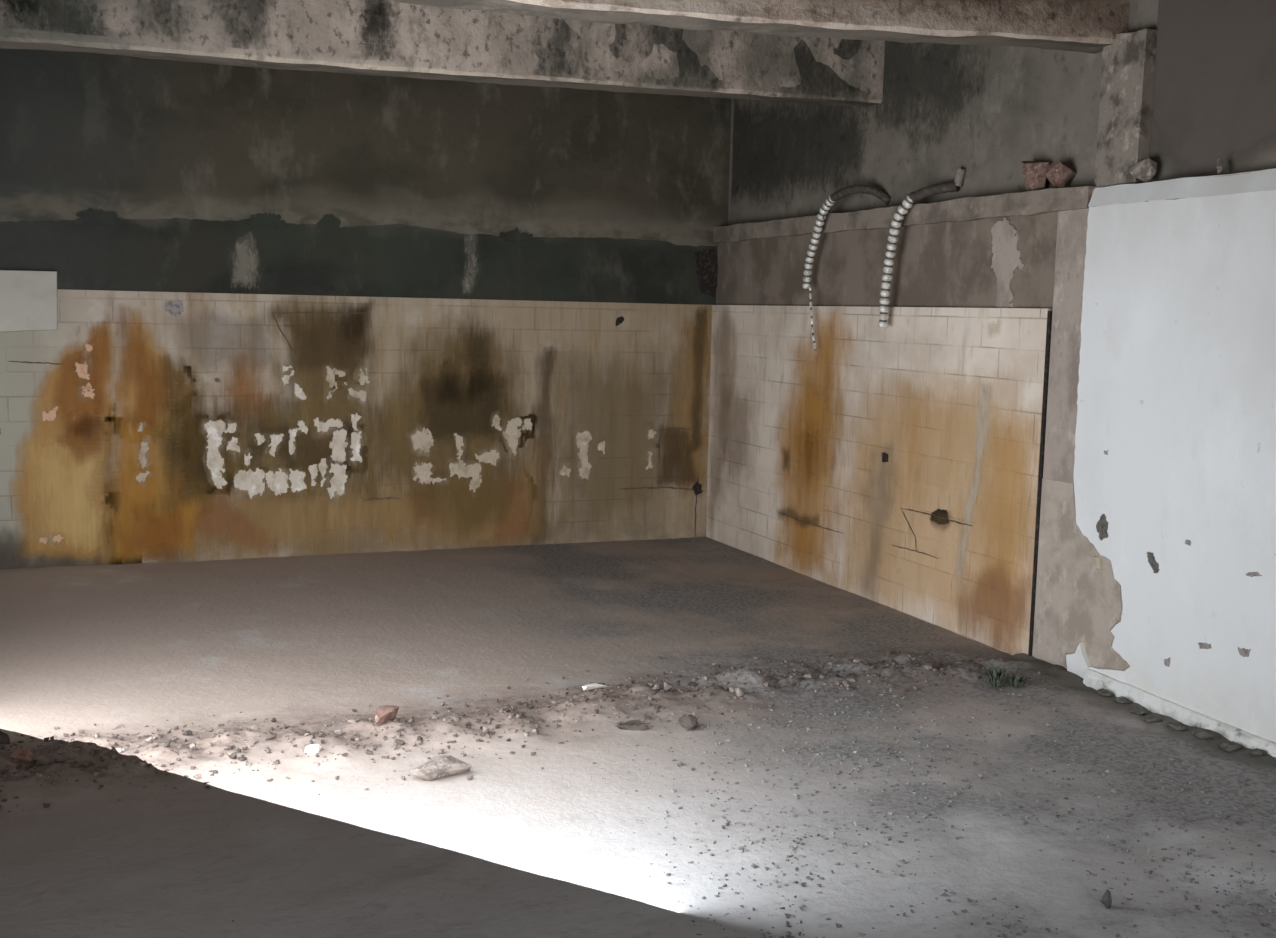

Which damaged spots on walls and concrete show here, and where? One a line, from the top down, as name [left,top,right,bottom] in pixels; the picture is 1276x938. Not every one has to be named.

water stain [3,0,103,36]
water stain [228,0,264,45]
water stain [363,0,388,53]
water stain [651,27,721,85]
water stain [232,235,259,289]
corrosion [20,321,197,556]
peeling [204,366,370,499]
water stain [155,305,553,552]
peeling [411,415,533,492]
corrosion [779,323,835,563]
flaking render [1032,478,1130,670]